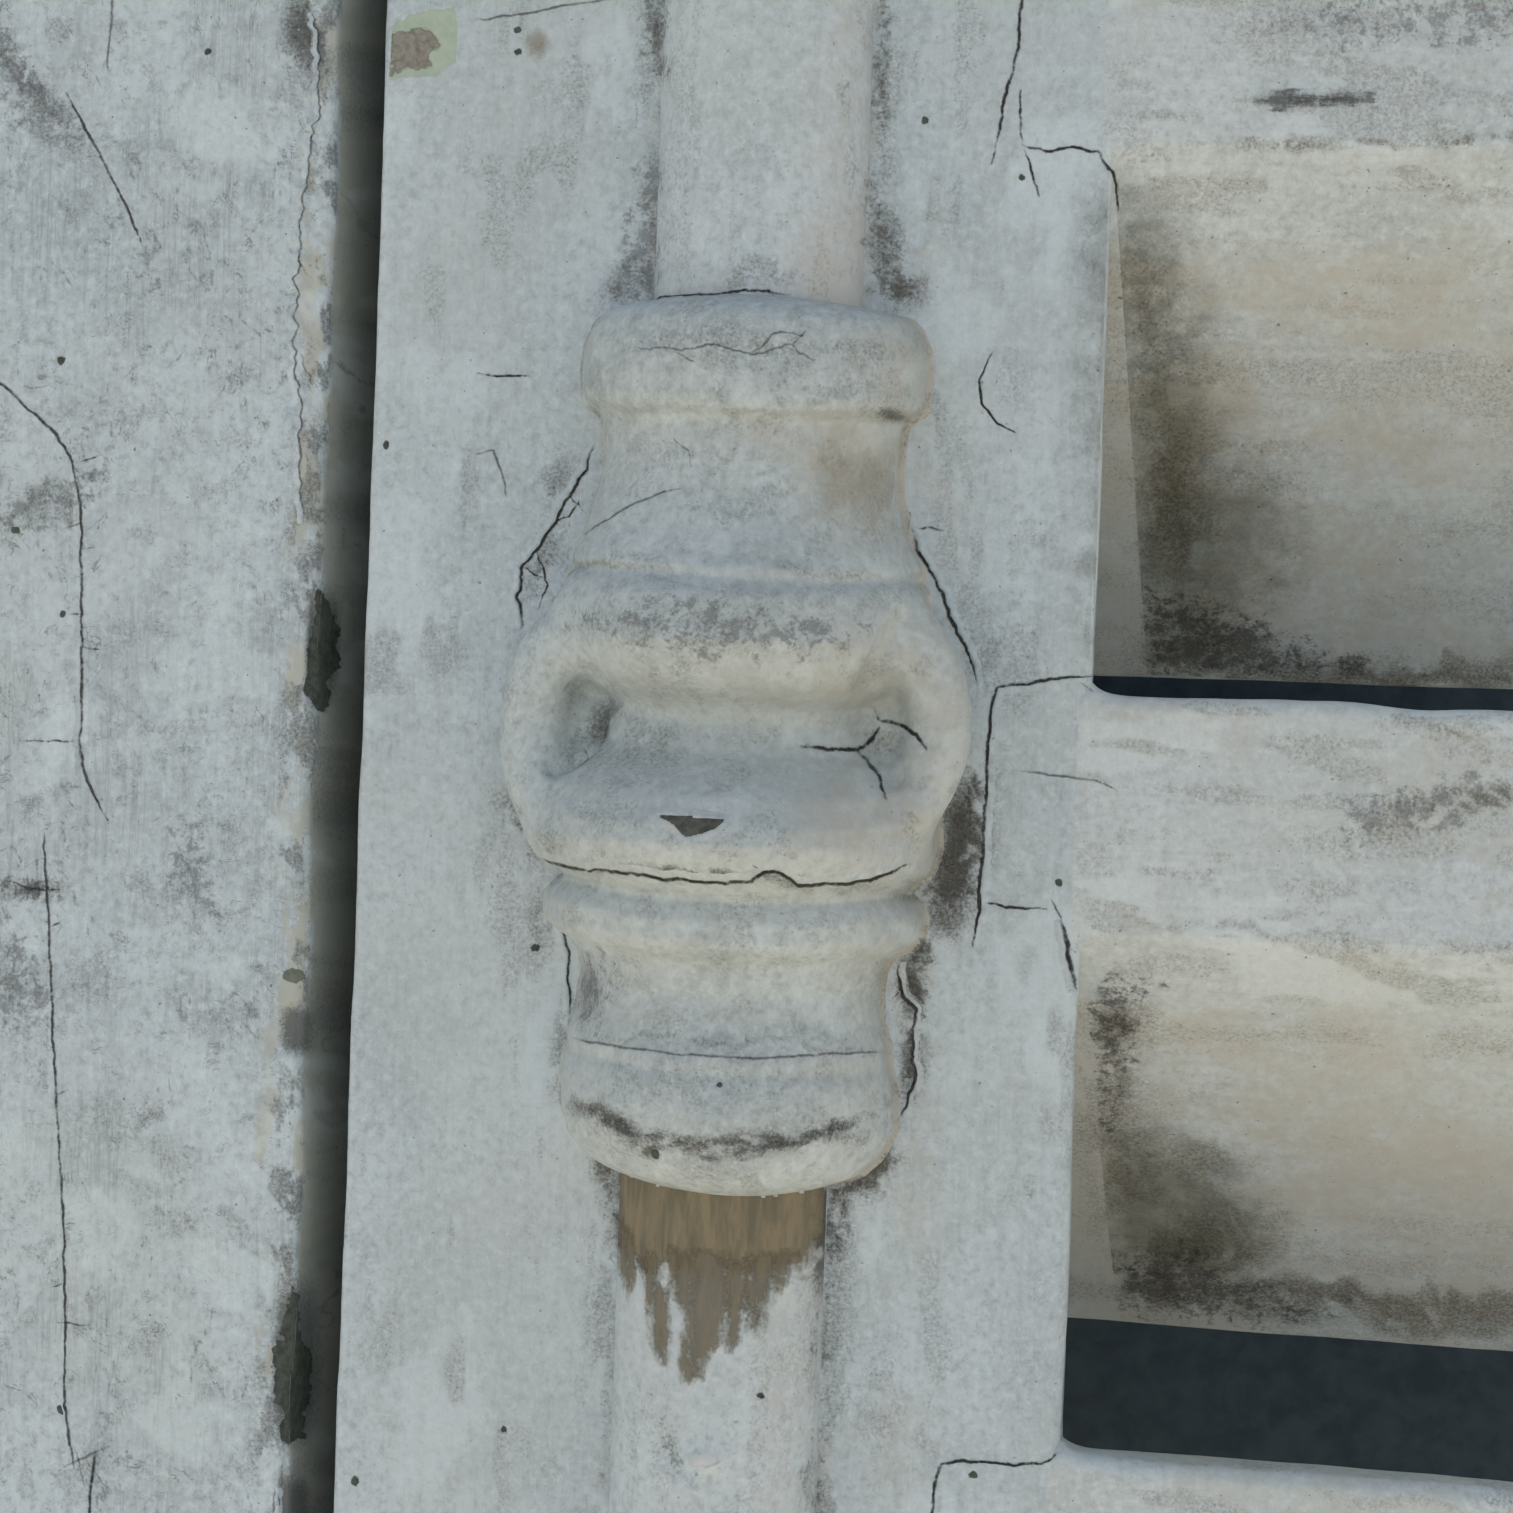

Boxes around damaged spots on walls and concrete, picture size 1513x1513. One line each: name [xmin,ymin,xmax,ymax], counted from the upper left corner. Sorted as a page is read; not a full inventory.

peeling [385,2,464,86]
crack [993,0,1119,208]
crack [0,382,110,828]
crack [509,444,670,630]
damp [1144,591,1370,678]
peeling [646,807,735,845]
crack [542,851,910,888]
crack [909,512,1092,993]
damp [1089,973,1167,1132]
crack [14,831,95,1513]
rust [618,1173,824,1383]
damp [1118,1239,1350,1325]